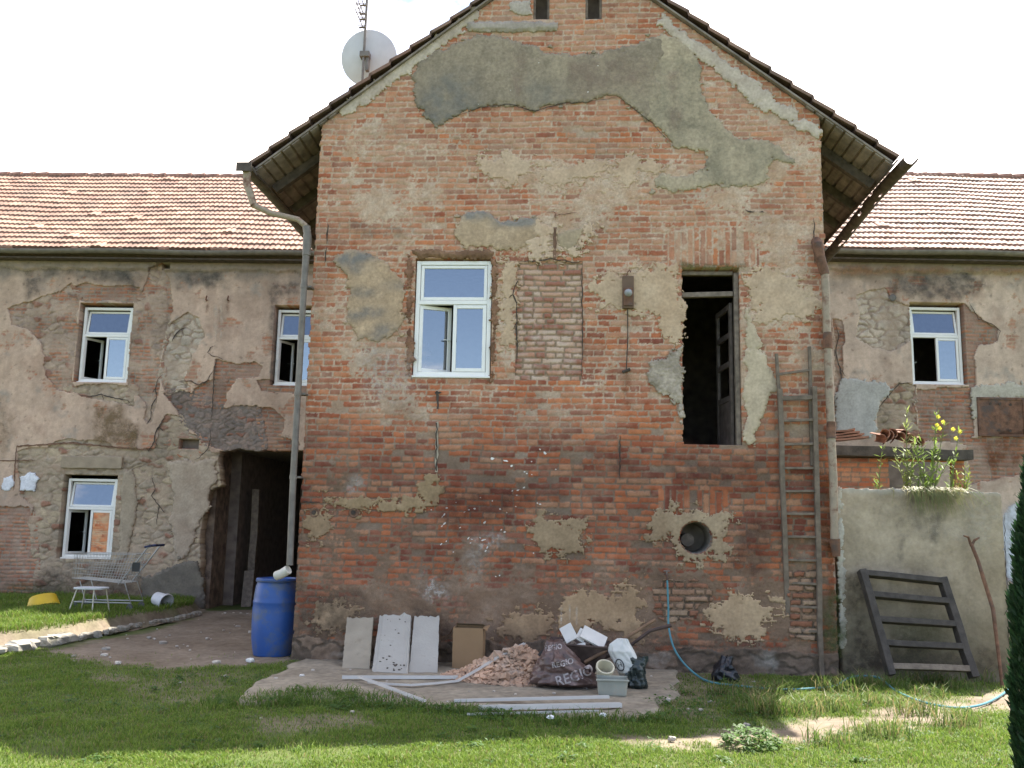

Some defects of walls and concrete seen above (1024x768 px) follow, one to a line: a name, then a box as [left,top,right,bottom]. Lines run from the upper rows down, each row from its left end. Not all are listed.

flaking render [411,33,795,195]
crack [81,346,222,460]
flaking render [0,263,307,609]
flaking render [833,288,911,414]
flaking render [877,303,1024,484]
crack [151,477,172,533]
hole [681,522,712,554]
flaking render [304,596,365,637]
flaking render [484,569,817,647]